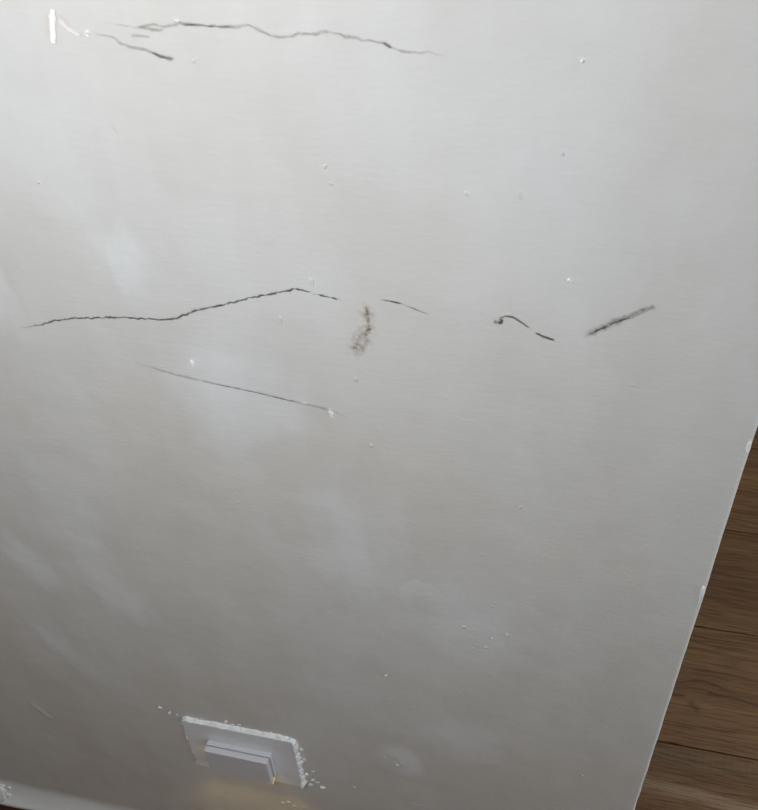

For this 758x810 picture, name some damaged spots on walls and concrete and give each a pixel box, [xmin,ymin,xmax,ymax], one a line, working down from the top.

crack [42,288,336,325]
crack [494,316,553,340]
peeling [158,706,326,789]